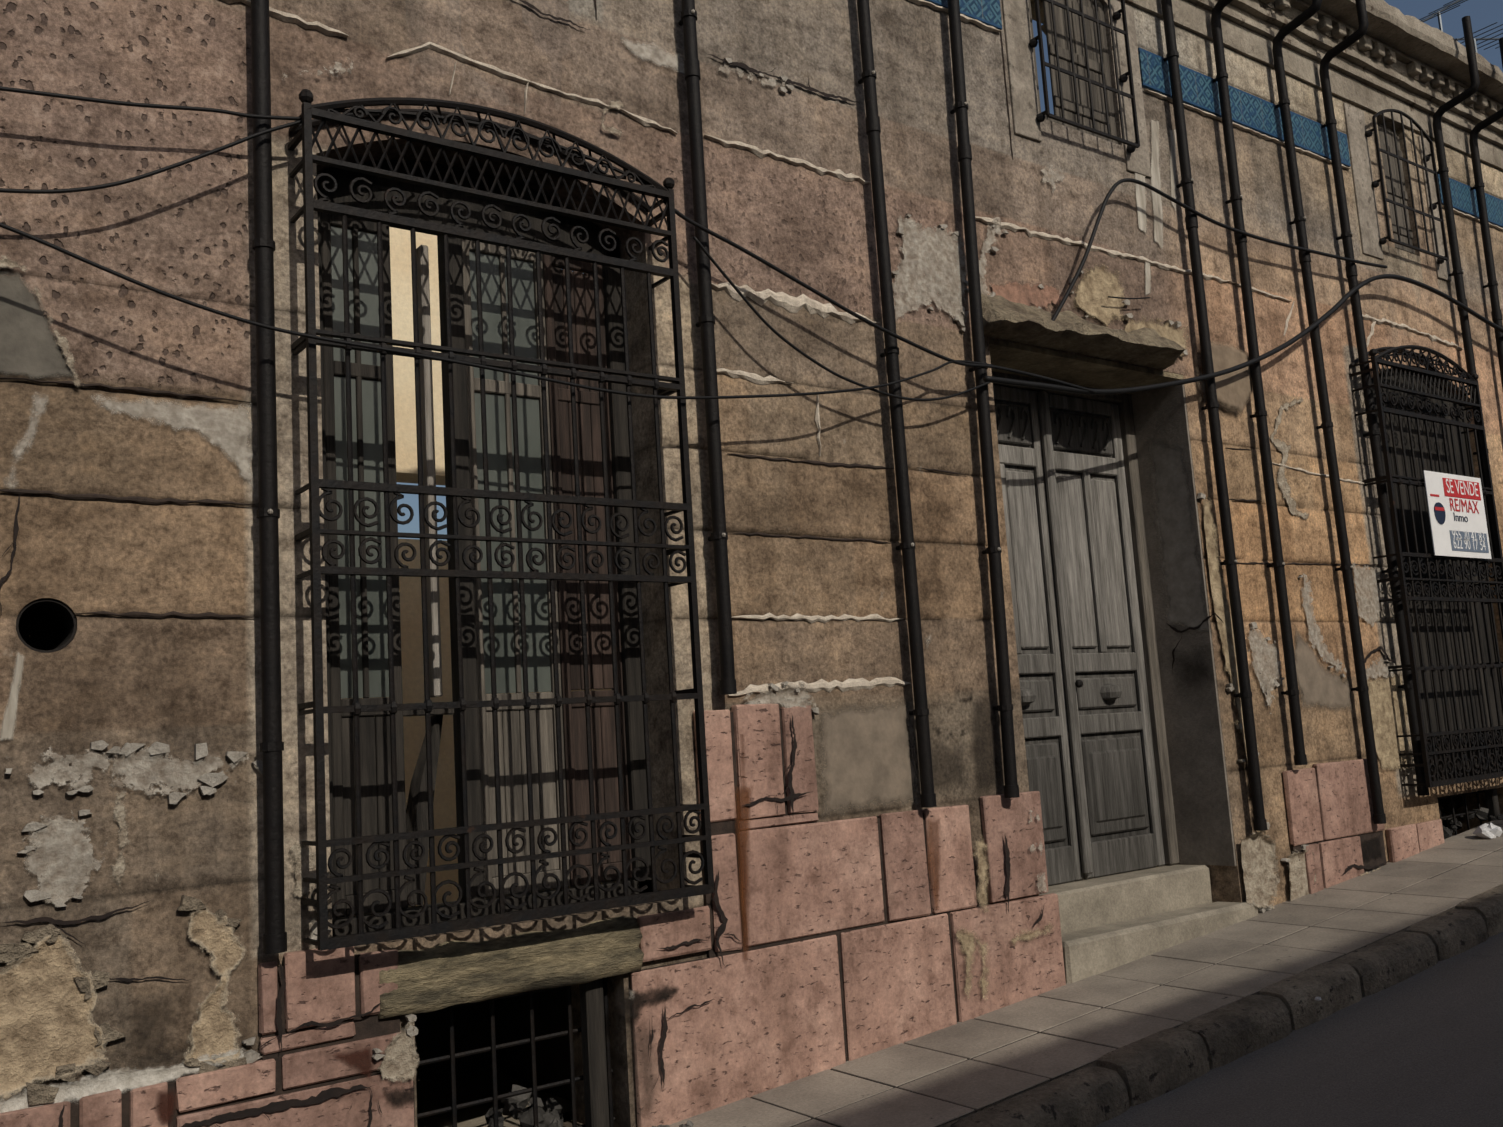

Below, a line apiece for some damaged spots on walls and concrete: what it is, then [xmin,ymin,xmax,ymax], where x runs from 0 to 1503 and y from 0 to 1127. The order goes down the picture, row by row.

flaking render [891,213,1188,357]
crack [0,492,21,618]
crack [741,713,810,818]
spalling [0,740,263,1105]
crack [650,871,740,1089]
crack [181,1084,382,1127]
spalling [372,1014,420,1082]